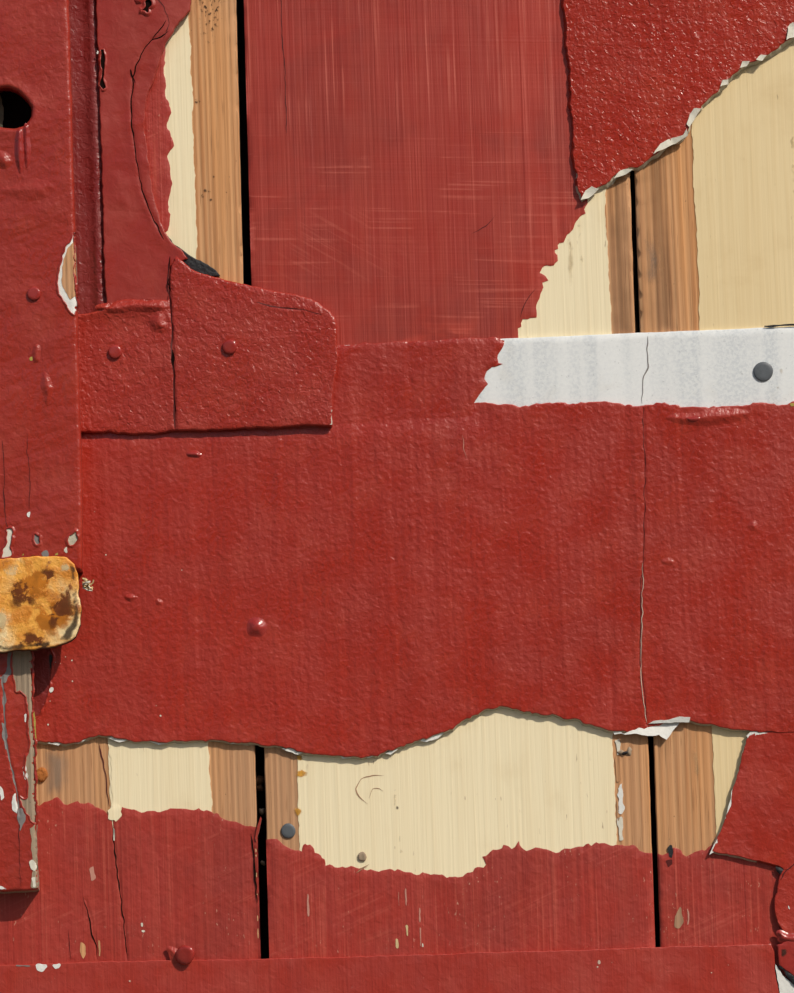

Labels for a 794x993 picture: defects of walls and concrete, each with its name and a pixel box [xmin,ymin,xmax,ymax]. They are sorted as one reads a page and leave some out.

peeling [654,108,701,154]
crack [130,0,176,427]
peeling [581,186,599,200]
peeling [55,232,80,317]
peeling [168,237,220,277]
crack [639,338,649,723]
rust [0,570,78,649]
peeling [0,651,39,888]
peeling [615,739,625,841]
peeling [775,949,794,993]